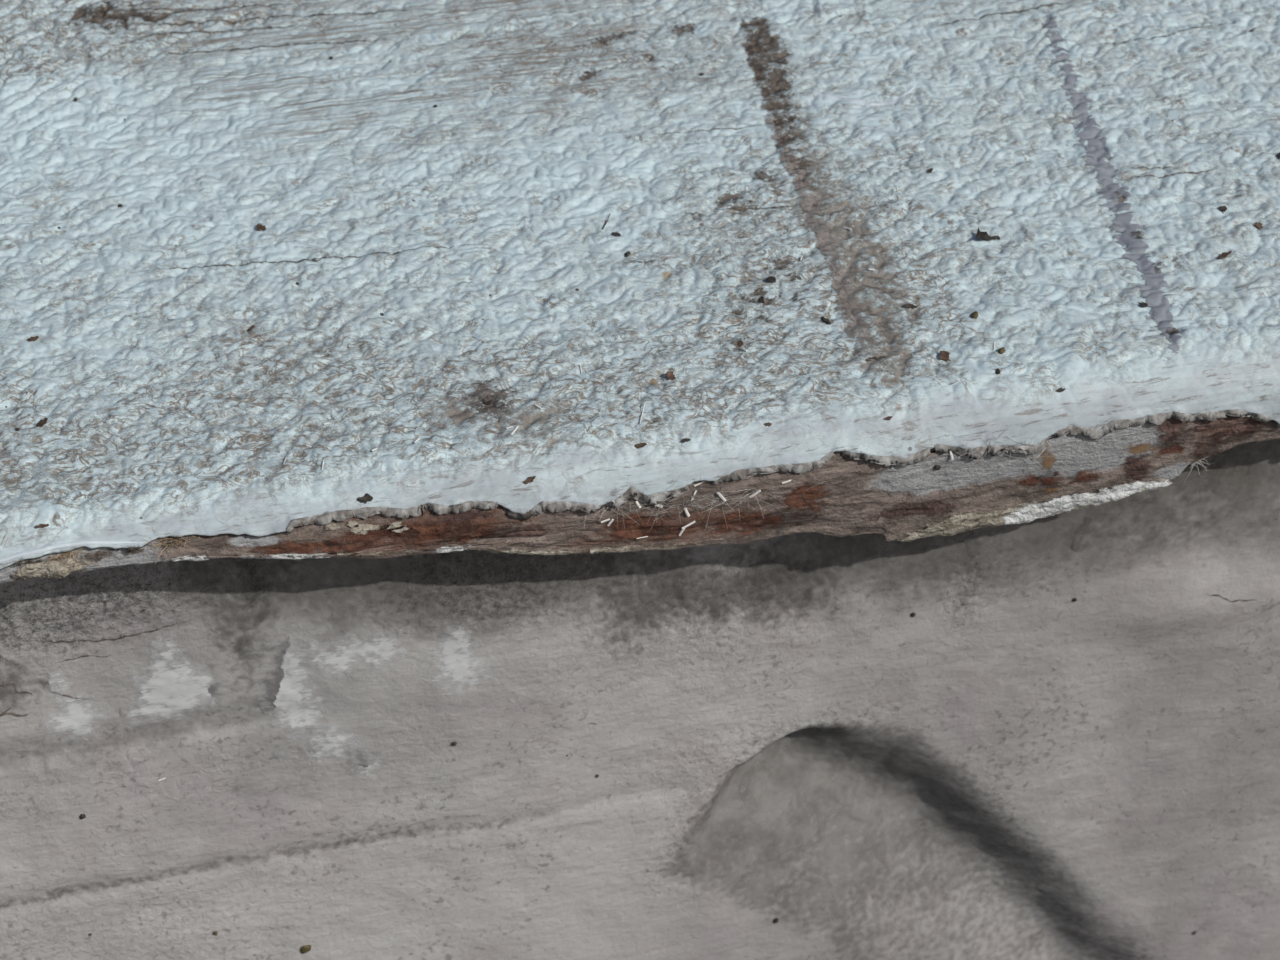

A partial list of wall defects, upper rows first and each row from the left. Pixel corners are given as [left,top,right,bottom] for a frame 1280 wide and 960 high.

water stain [732,15,923,388]
spalling [0,409,1280,584]
water stain [1188,439,1280,502]
water stain [46,673,106,737]
water stain [272,637,405,762]
water stain [0,504,1098,727]